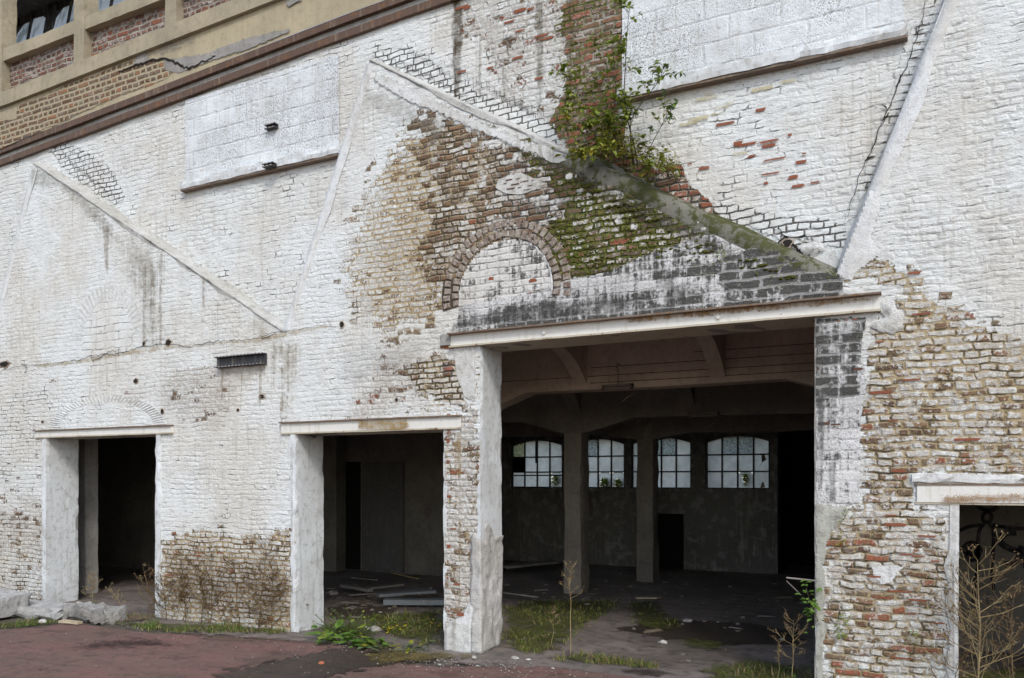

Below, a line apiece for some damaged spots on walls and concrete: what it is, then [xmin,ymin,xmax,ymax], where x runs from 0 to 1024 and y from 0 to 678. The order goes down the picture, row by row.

crack [118,55,216,72]
peeling [455,0,720,230]
peeling [734,133,819,188]
peeling [333,103,590,348]
water stain [620,191,843,305]
crack [4,324,324,373]
water stain [452,295,651,331]
water stain [816,316,866,448]
peeling [0,511,43,600]
peeling [161,525,296,633]
peeling [398,352,504,654]
peeling [816,258,1024,678]